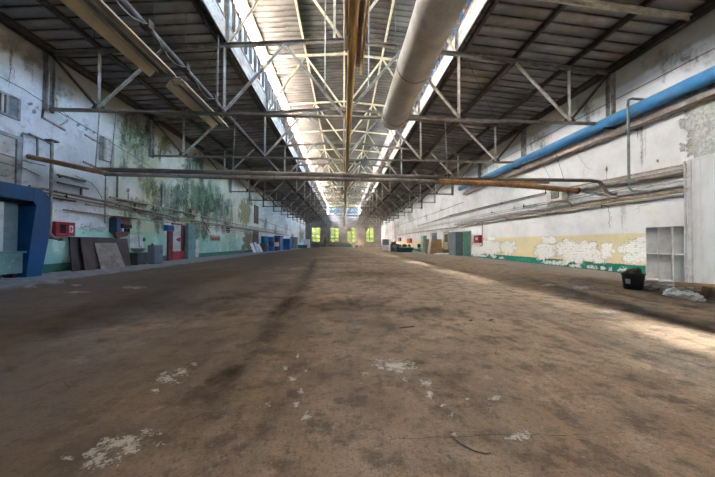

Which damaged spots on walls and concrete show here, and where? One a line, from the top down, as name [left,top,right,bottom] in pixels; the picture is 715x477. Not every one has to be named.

flaking render [679,98,715,158]
leakage [129,177,232,240]
peeling [471,236,518,259]
peeling [534,236,646,272]